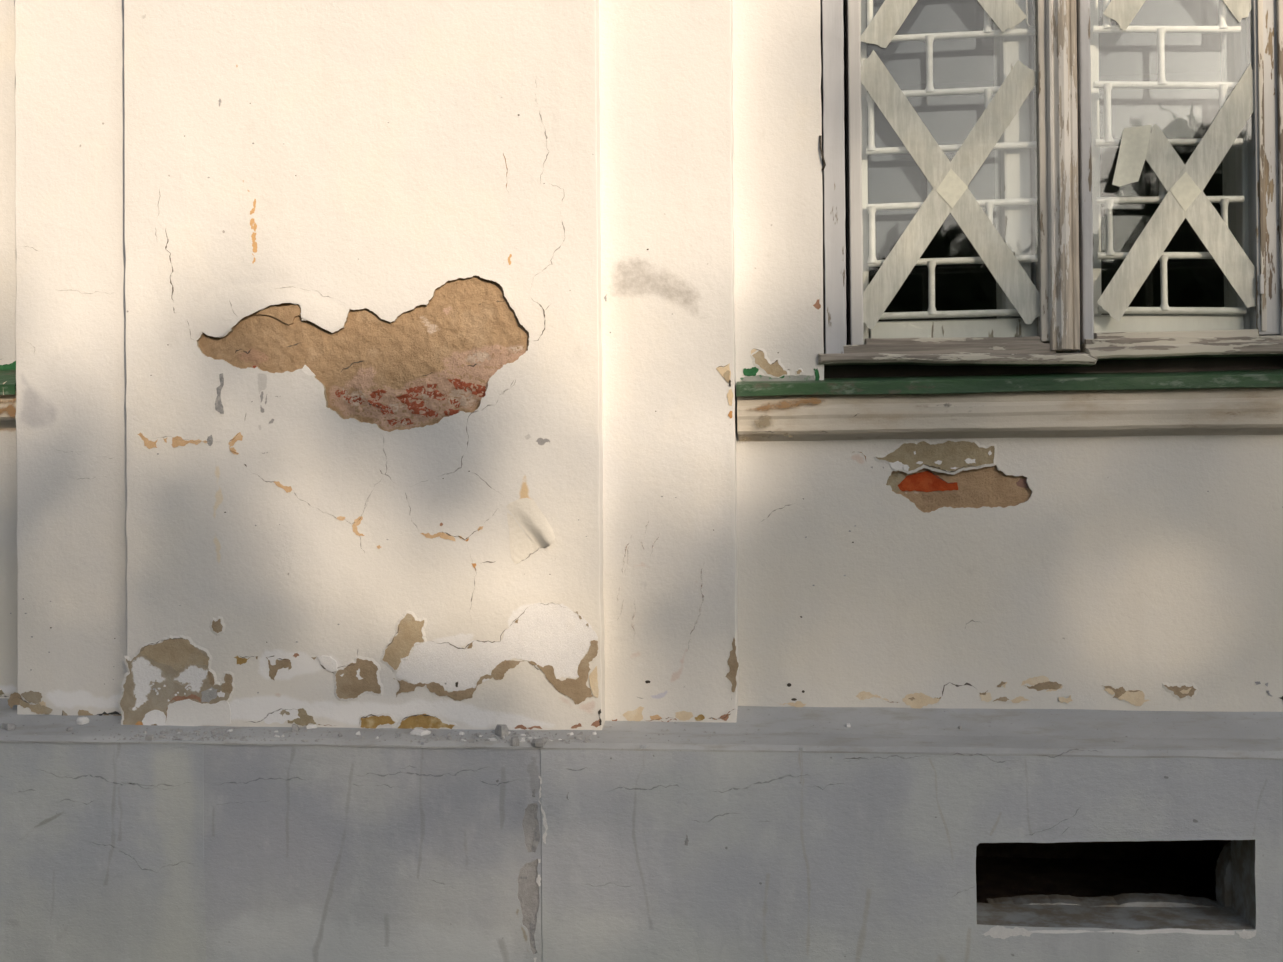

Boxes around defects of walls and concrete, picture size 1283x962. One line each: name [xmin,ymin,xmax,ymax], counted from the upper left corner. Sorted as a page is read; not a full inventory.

flaking render [198,276,529,432]
flaking render [873,438,1032,513]
peeling [0,601,734,736]
peeling [856,691,941,709]
peeling [980,676,1073,703]
peeling [1103,686,1151,706]
peeling [1162,682,1199,701]
flaking render [517,776,548,962]